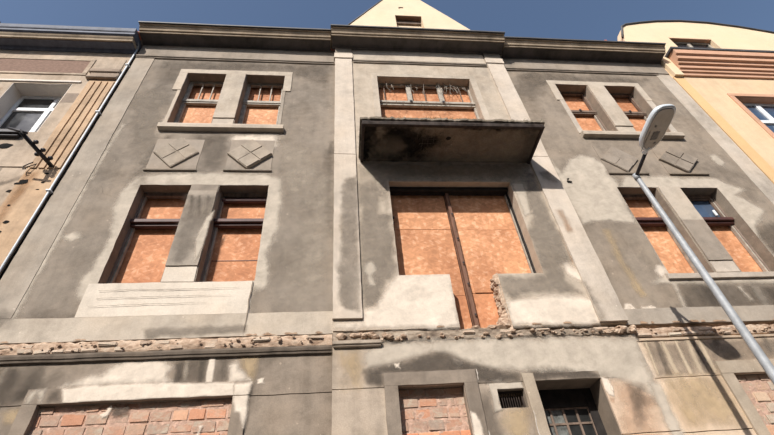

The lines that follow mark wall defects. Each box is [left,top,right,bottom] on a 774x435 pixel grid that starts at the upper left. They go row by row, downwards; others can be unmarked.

water stain [360,122,439,162]
spalling [490,273,524,338]
flaking render [0,339,124,355]
flaking render [636,320,731,338]